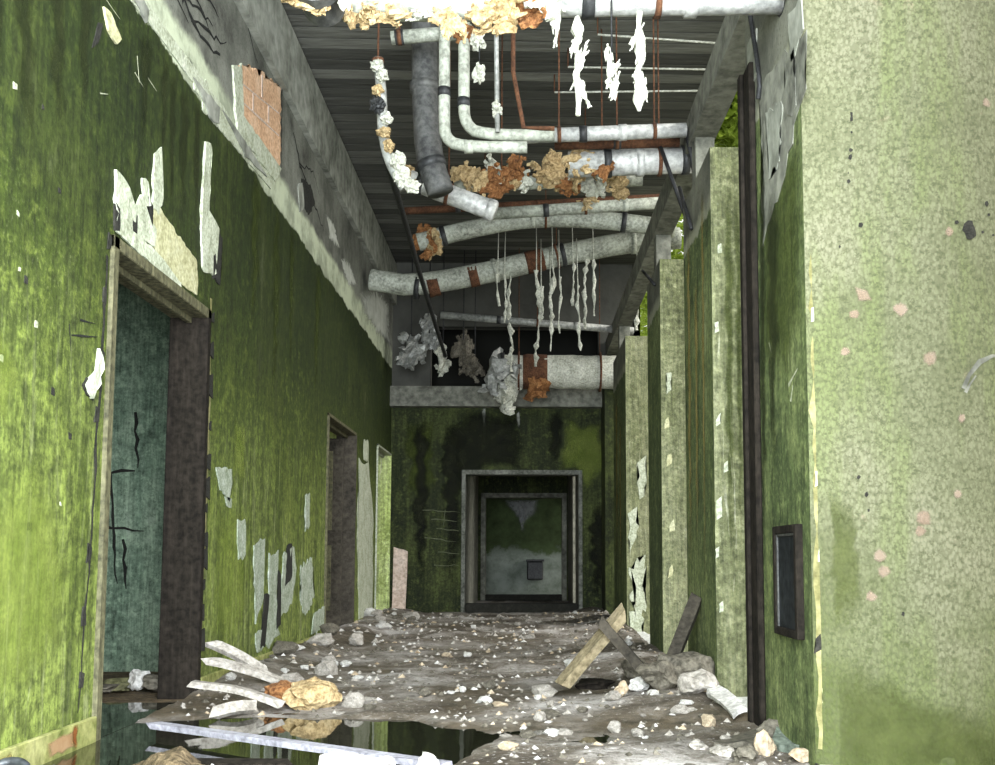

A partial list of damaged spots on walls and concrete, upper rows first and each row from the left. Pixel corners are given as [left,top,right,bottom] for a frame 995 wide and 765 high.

crack [177,0,227,56]
spalling [130,0,283,189]
flaking render [78,141,223,711]
spalling [203,342,232,590]
peeling [237,519,325,653]
water stain [412,429,429,562]
water stain [441,413,520,571]
water stain [509,501,536,525]
water stain [550,414,563,458]
water stain [588,507,602,589]
peeling [628,456,647,632]